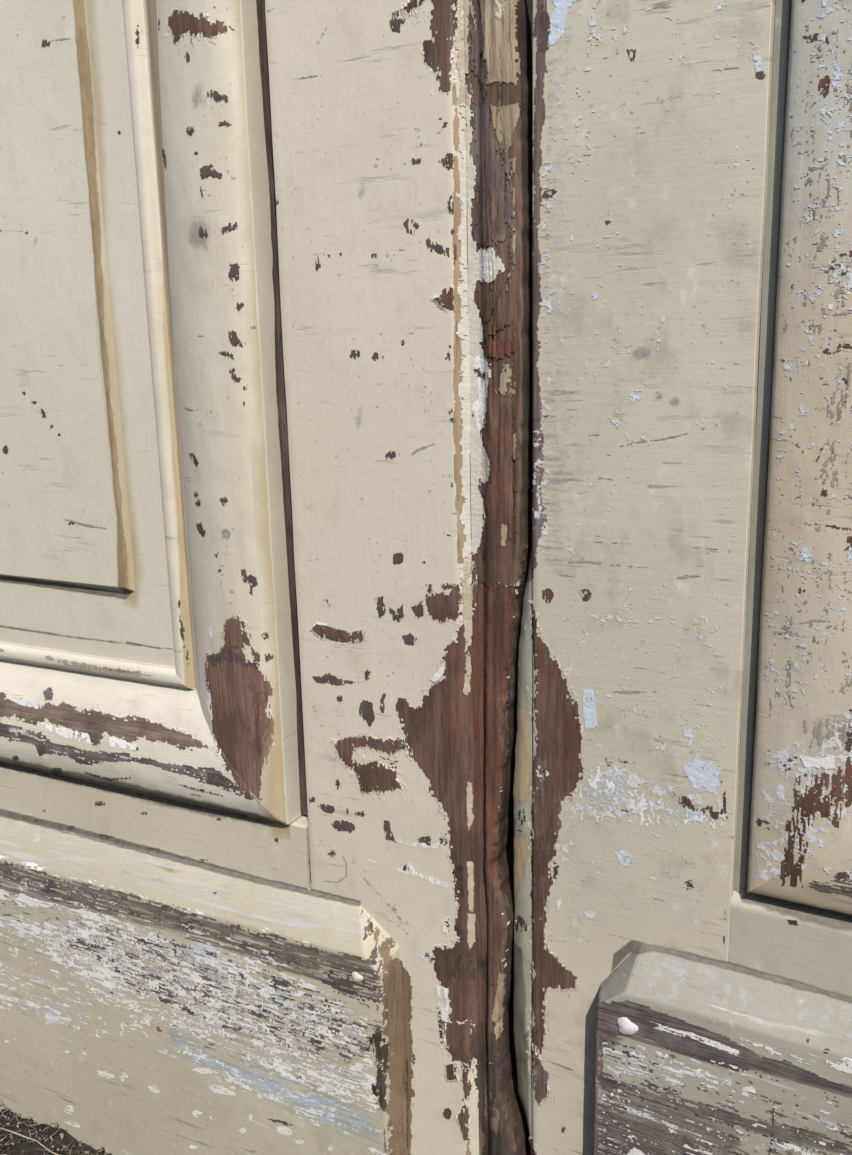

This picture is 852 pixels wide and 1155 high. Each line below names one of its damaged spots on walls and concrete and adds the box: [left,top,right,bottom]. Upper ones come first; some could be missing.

peeling [158,8,239,63]
peeling [734,34,766,79]
peeling [0,609,280,808]
peeling [310,620,367,645]
peeling [330,0,731,1142]
peeling [309,797,365,833]
peeling [0,855,390,1155]
peeling [593,990,852,1155]